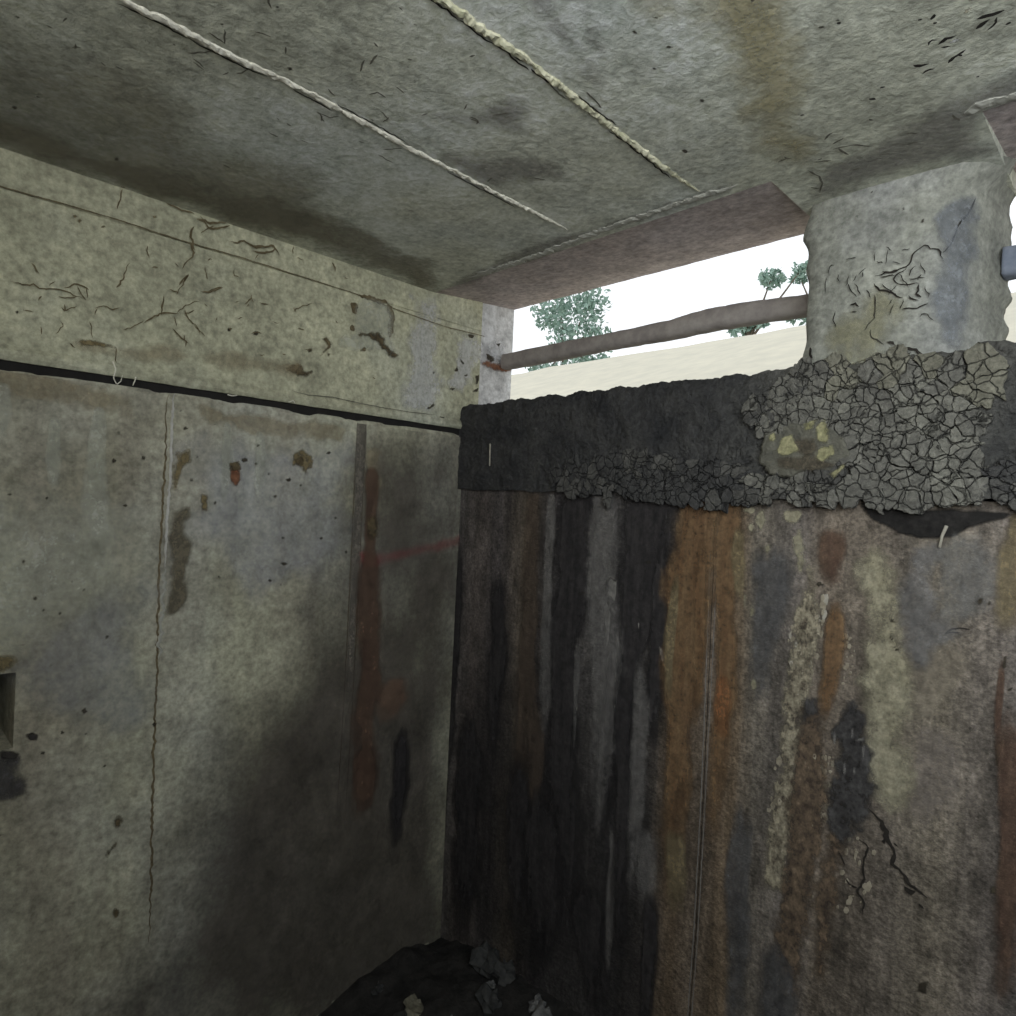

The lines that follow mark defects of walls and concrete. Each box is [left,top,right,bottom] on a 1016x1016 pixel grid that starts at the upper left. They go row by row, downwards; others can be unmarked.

crack [119,4,262,75]
crack [431,0,550,84]
crack [294,90,408,144]
crack [577,95,671,179]
crack [0,186,482,336]
peeling [350,294,398,357]
crack [548,198,1016,515]
rust [819,531,846,581]
rust [662,501,718,897]
rust [820,607,846,711]
damp [0,751,26,800]
crack [838,809,927,911]